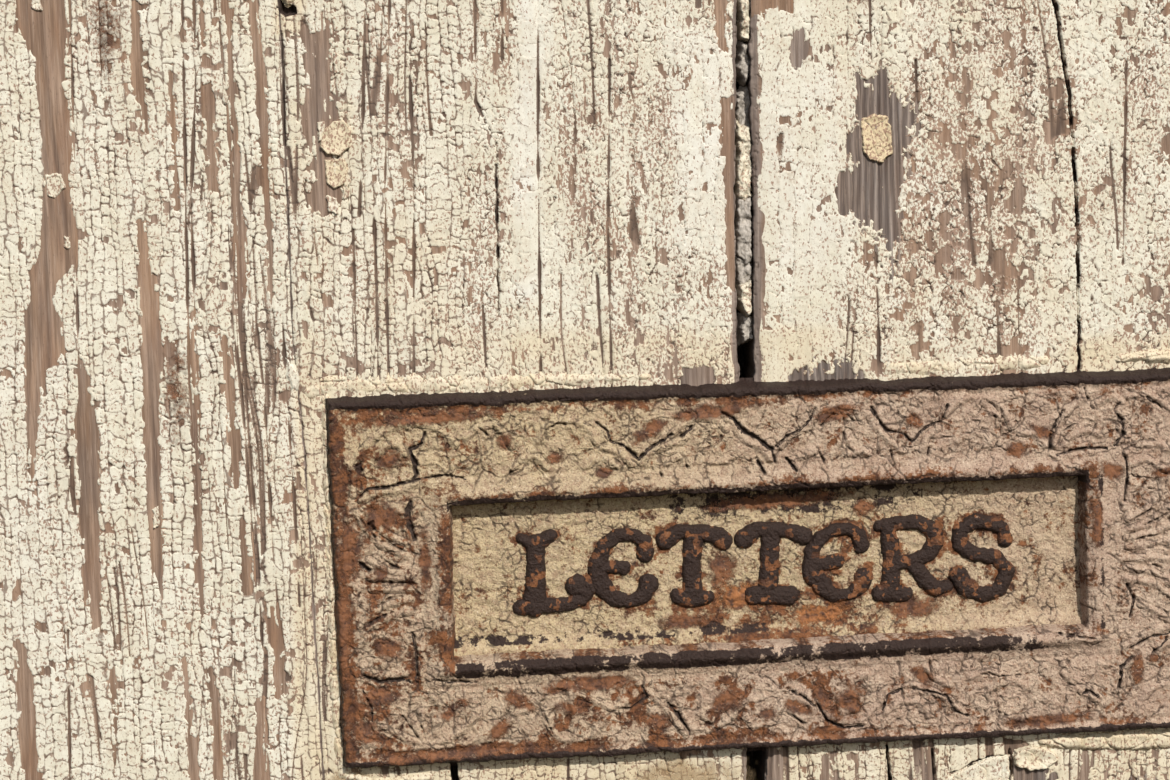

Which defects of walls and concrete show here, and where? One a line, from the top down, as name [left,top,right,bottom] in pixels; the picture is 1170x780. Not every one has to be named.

peeling [201,0,277,306]
peeling [295,11,352,222]
peeling [835,64,924,286]
crack [1051,0,1080,287]
peeling [15,0,105,632]
peeling [135,219,168,599]
corrosion [632,402,754,445]
crack [1075,320,1083,369]
corrosion [334,502,413,693]
crack [450,764,459,780]
corrosion [542,674,630,716]
corrosion [1006,711,1091,728]